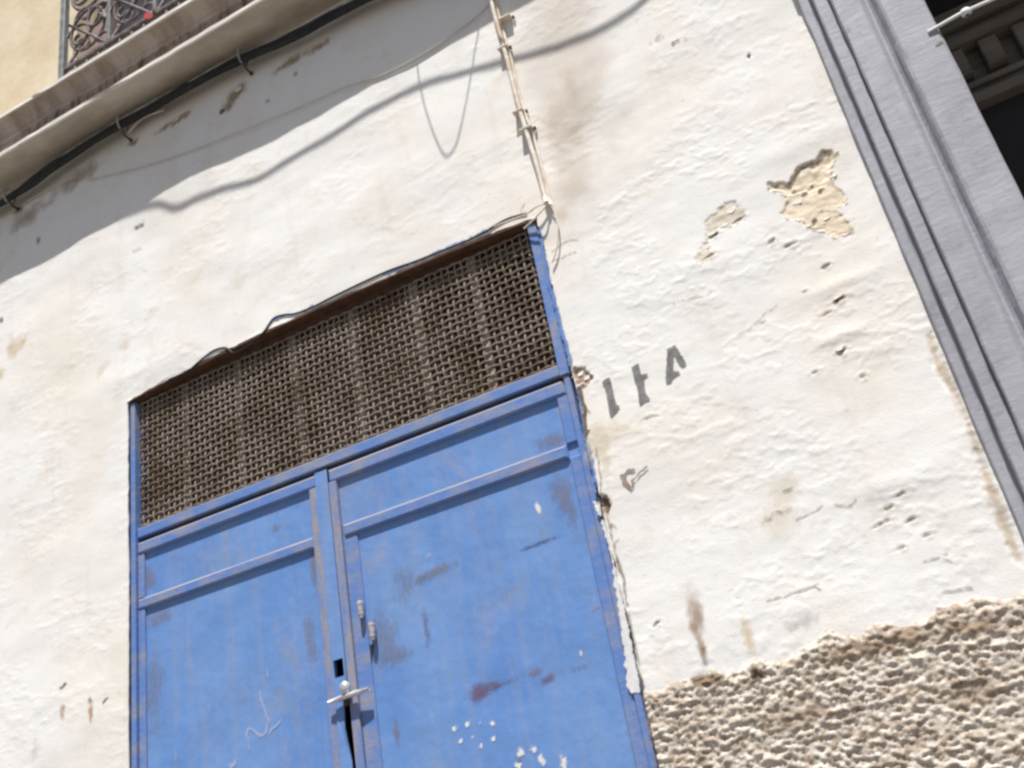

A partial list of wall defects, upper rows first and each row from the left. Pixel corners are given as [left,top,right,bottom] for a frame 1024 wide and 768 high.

spalling [767,149,854,238]
flaking render [694,200,745,263]
spalling [572,367,593,387]
water stain [691,604,705,660]
spalling [690,672,724,688]
spalling [750,665,766,683]